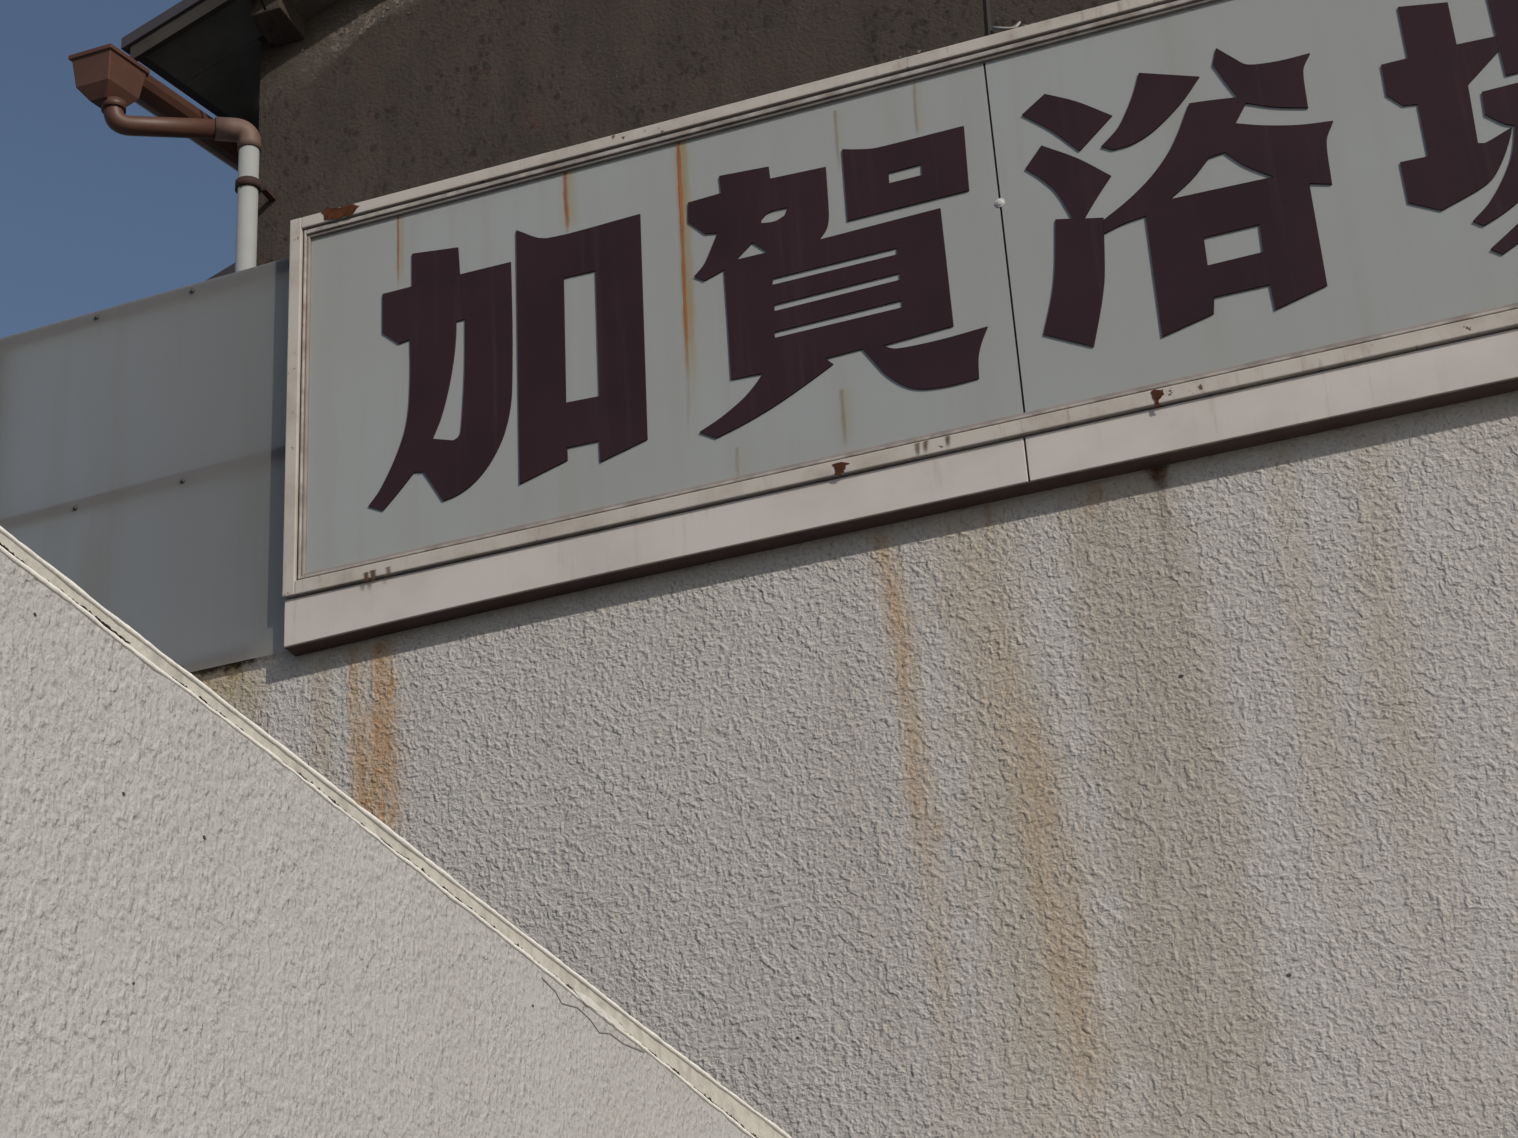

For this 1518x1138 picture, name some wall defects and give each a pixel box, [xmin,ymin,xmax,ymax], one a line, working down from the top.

corrosion [1151,389,1164,407]
corrosion [832,462,850,475]